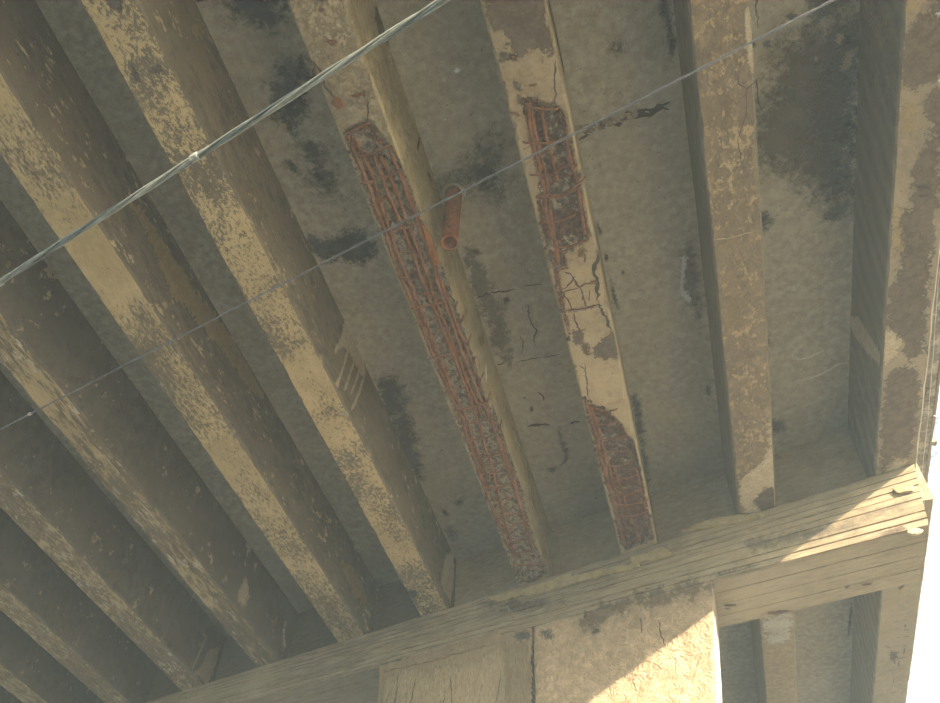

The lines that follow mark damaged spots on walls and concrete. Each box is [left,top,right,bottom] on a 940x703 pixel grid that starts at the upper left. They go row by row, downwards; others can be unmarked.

water stain [263,55,338,201]
spalling [343,119,548,584]
spalling [521,97,589,341]
crack [560,250,611,331]
crack [579,102,670,140]
water stain [752,0,860,221]
water stain [877,0,940,471]
spalling [582,396,655,550]